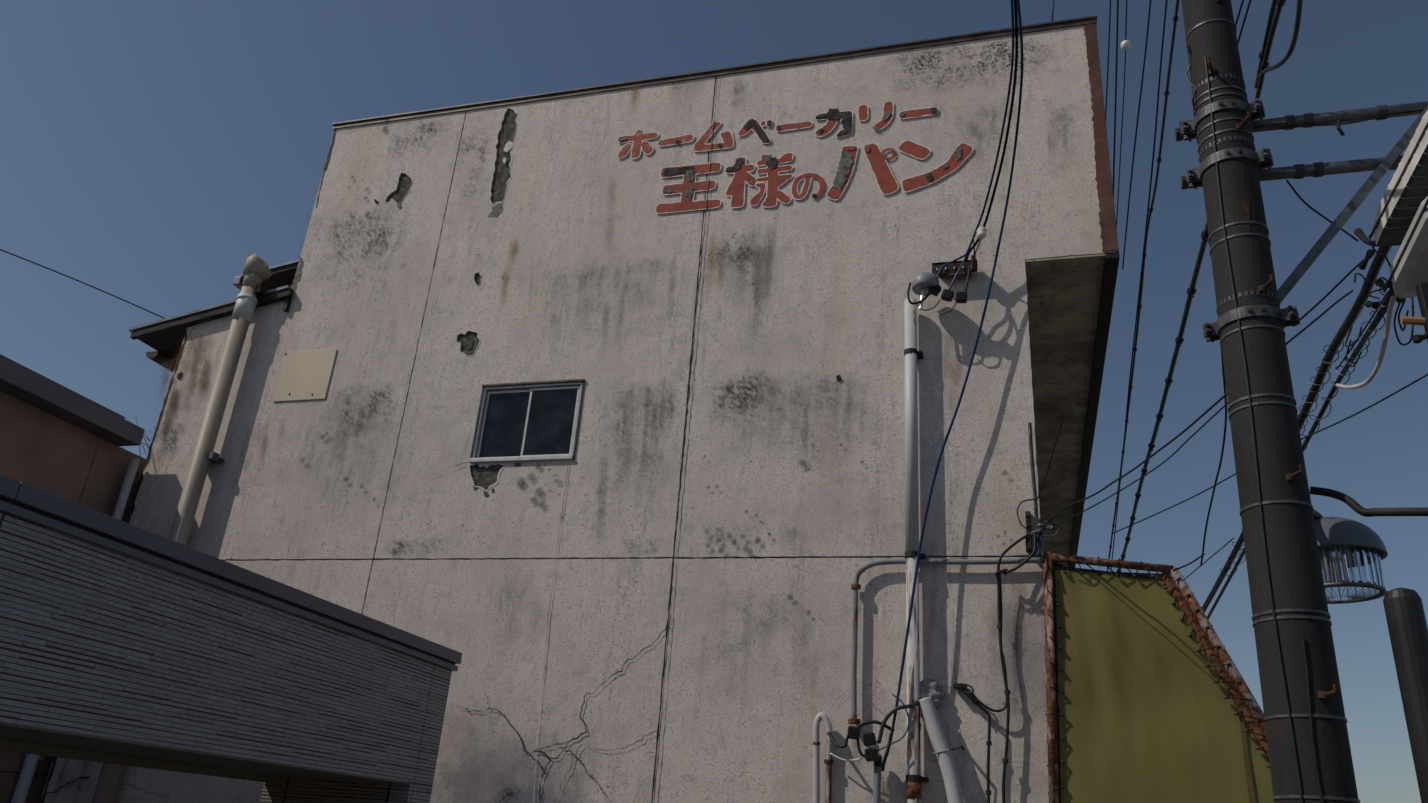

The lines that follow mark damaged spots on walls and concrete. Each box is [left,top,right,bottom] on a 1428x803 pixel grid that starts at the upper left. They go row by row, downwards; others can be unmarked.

spalling [488,106,517,218]
spalling [374,166,412,210]
spalling [455,330,481,356]
leakage [719,377,761,408]
crack [456,74,718,803]
spalling [468,463,521,497]